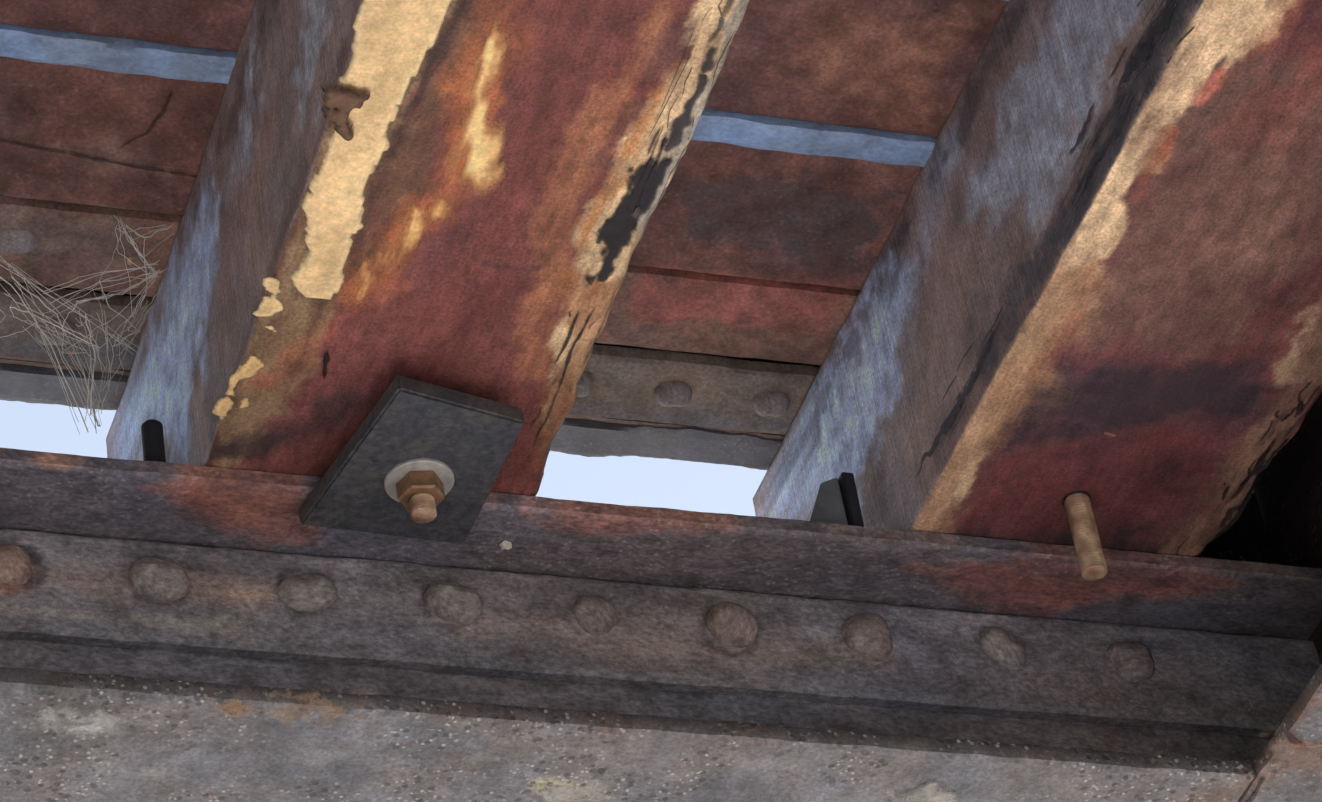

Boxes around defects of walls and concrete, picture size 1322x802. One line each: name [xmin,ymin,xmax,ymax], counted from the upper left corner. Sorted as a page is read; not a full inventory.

peeling [253,0,451,332]
crack [625,0,734,230]
crack [523,295,614,436]